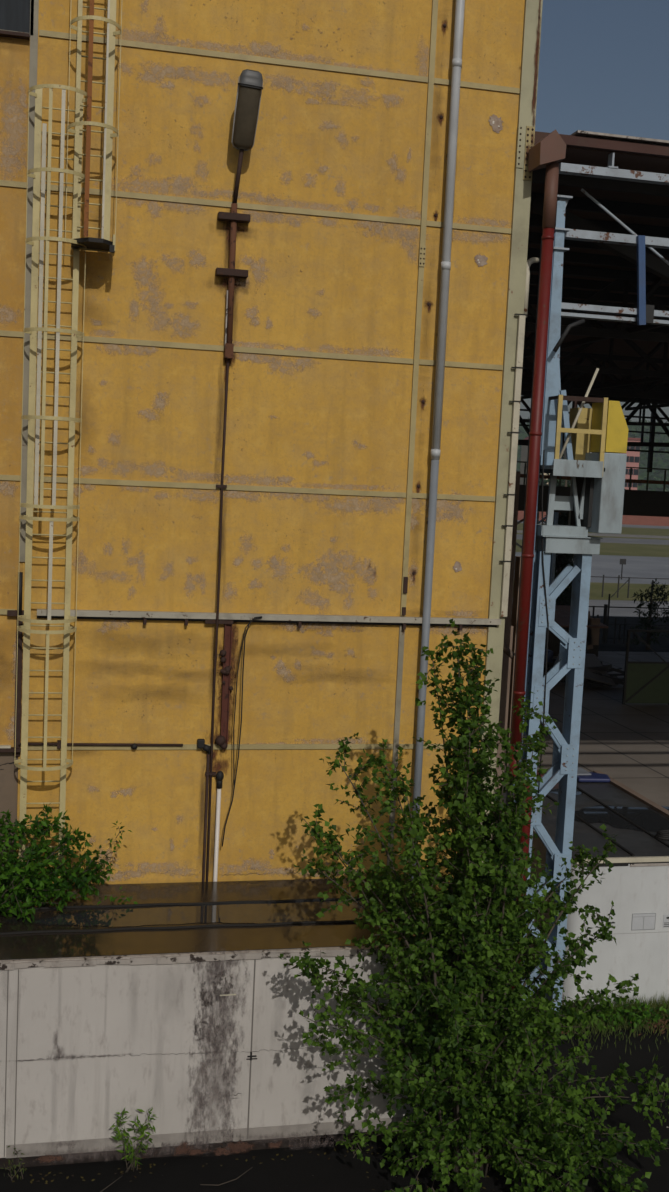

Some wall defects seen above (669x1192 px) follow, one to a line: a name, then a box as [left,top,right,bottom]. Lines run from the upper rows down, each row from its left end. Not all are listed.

flaking render [488,114,503,133]
corrosion [205,619,238,776]
damp [195,960,234,1116]